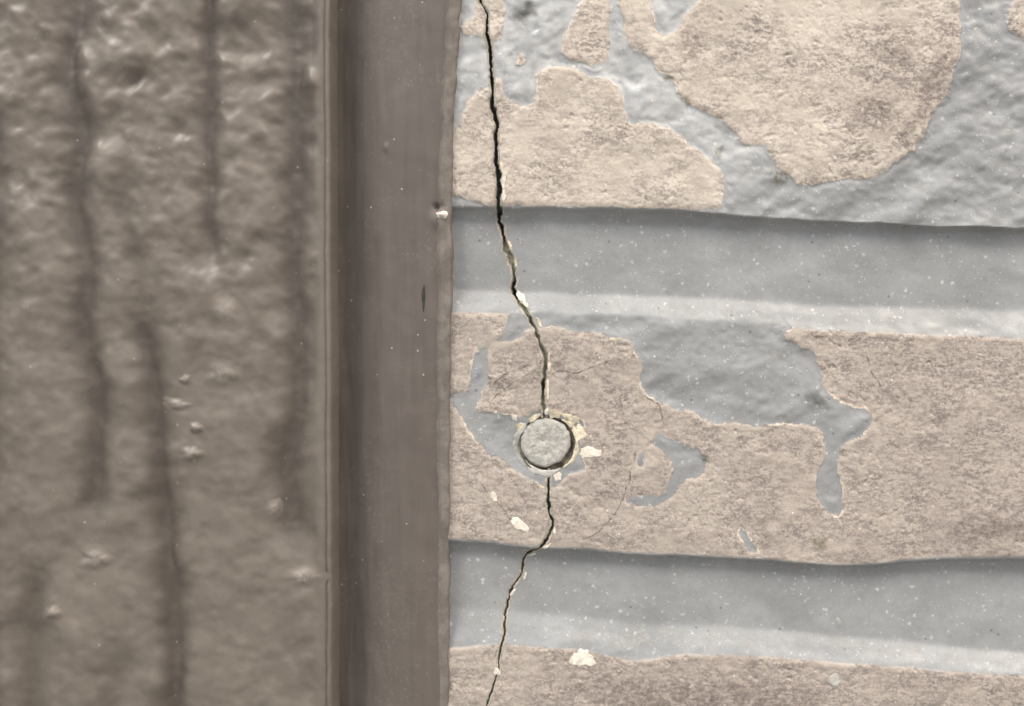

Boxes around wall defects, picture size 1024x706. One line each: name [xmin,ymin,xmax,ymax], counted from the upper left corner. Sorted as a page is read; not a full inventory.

crack [477,0,608,418]
peeling [452,0,1024,230]
peeling [450,312,871,518]
crack [482,468,556,706]
peeling [569,648,596,666]